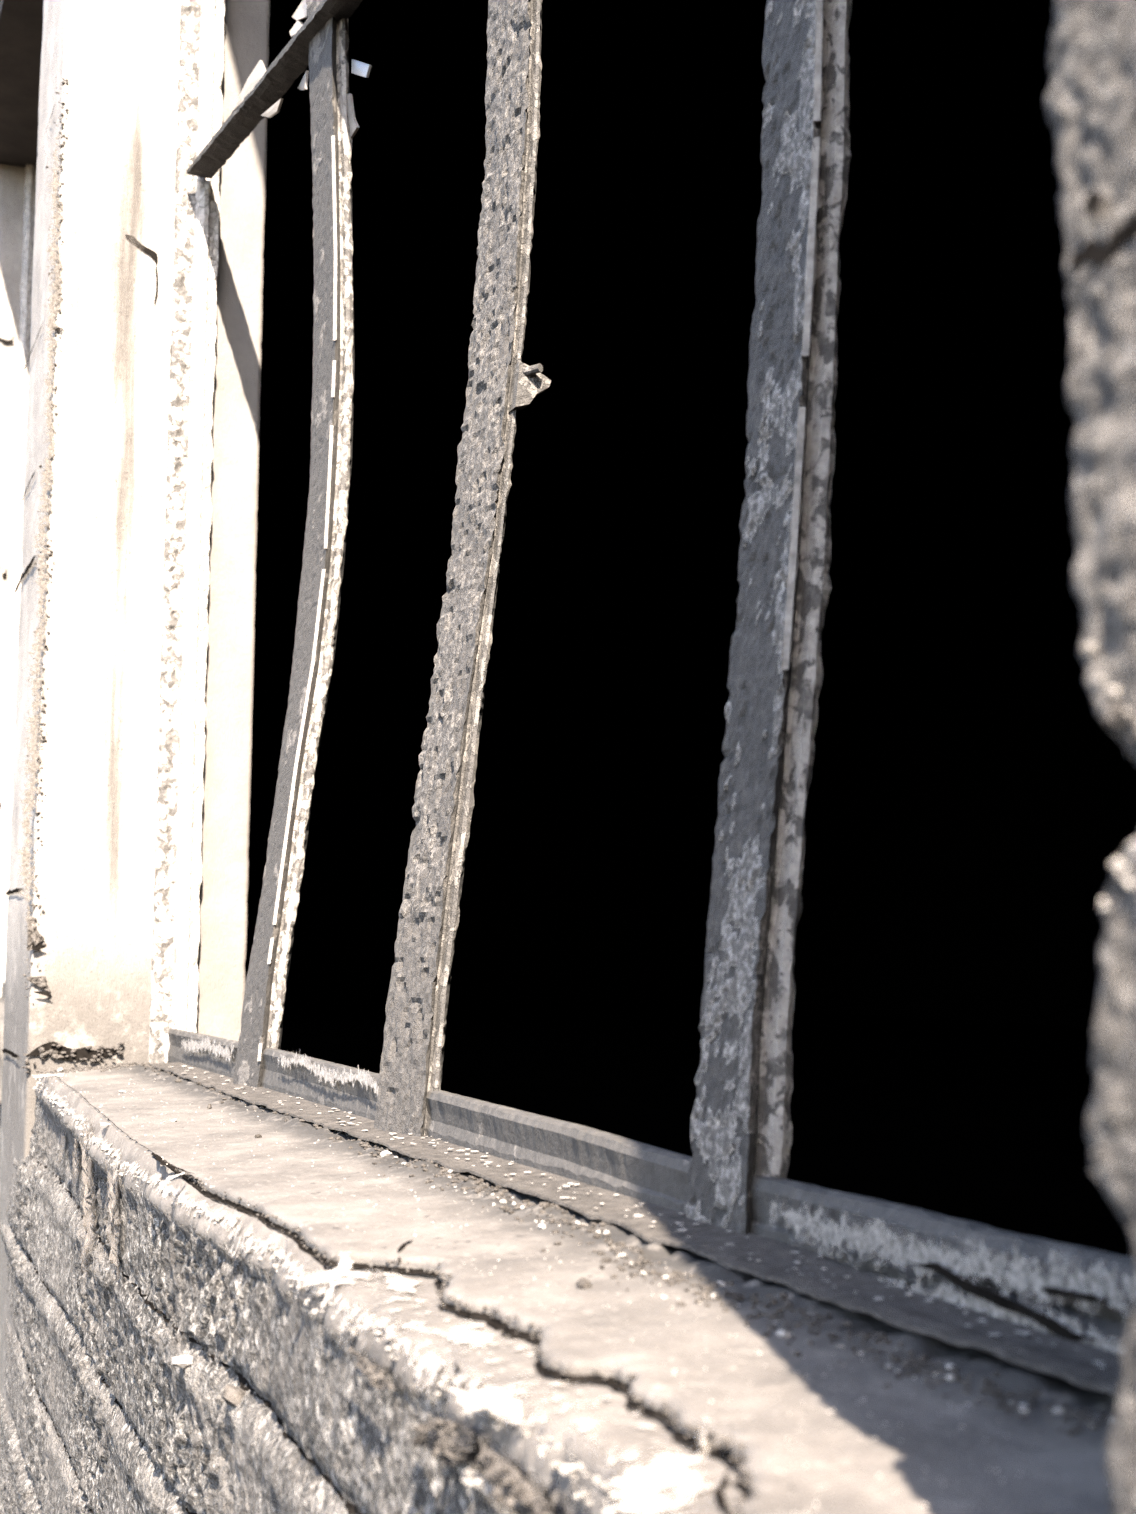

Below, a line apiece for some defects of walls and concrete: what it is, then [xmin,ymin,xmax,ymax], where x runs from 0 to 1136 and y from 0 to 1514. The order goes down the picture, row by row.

crack [1069,216,1136,270]
crack [151,1152,759,1514]